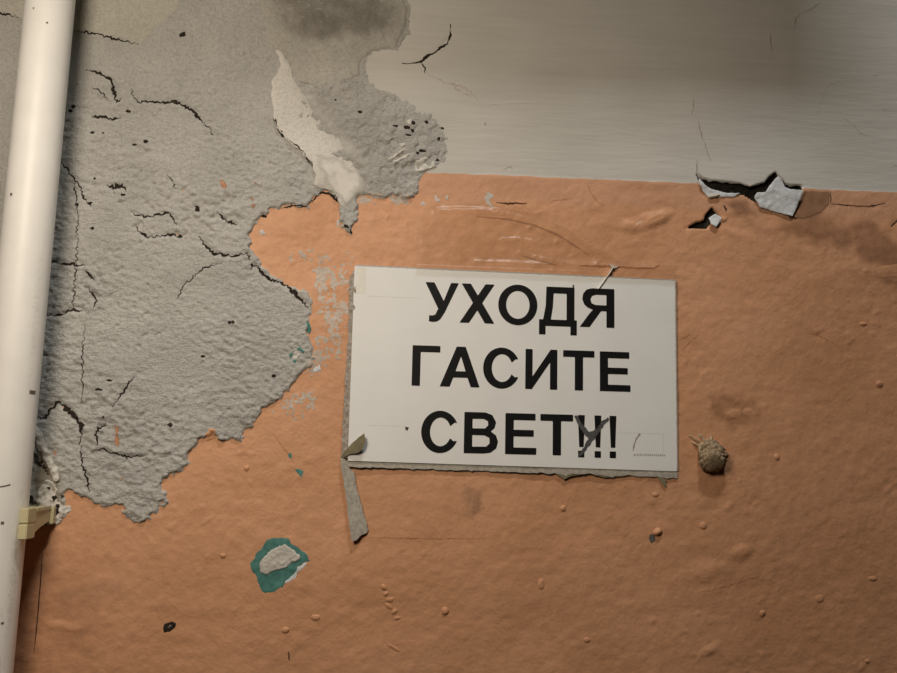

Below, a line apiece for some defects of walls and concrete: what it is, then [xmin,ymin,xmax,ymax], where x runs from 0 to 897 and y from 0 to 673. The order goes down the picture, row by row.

spalling [0,0,24,234]
crack [85,70,213,135]
crack [402,24,538,125]
crack [107,183,308,307]
spalling [29,0,448,526]
peeling [484,192,527,208]
peeling [688,172,829,229]
crack [830,191,897,226]
crack [37,163,141,492]
spalling [250,538,310,593]